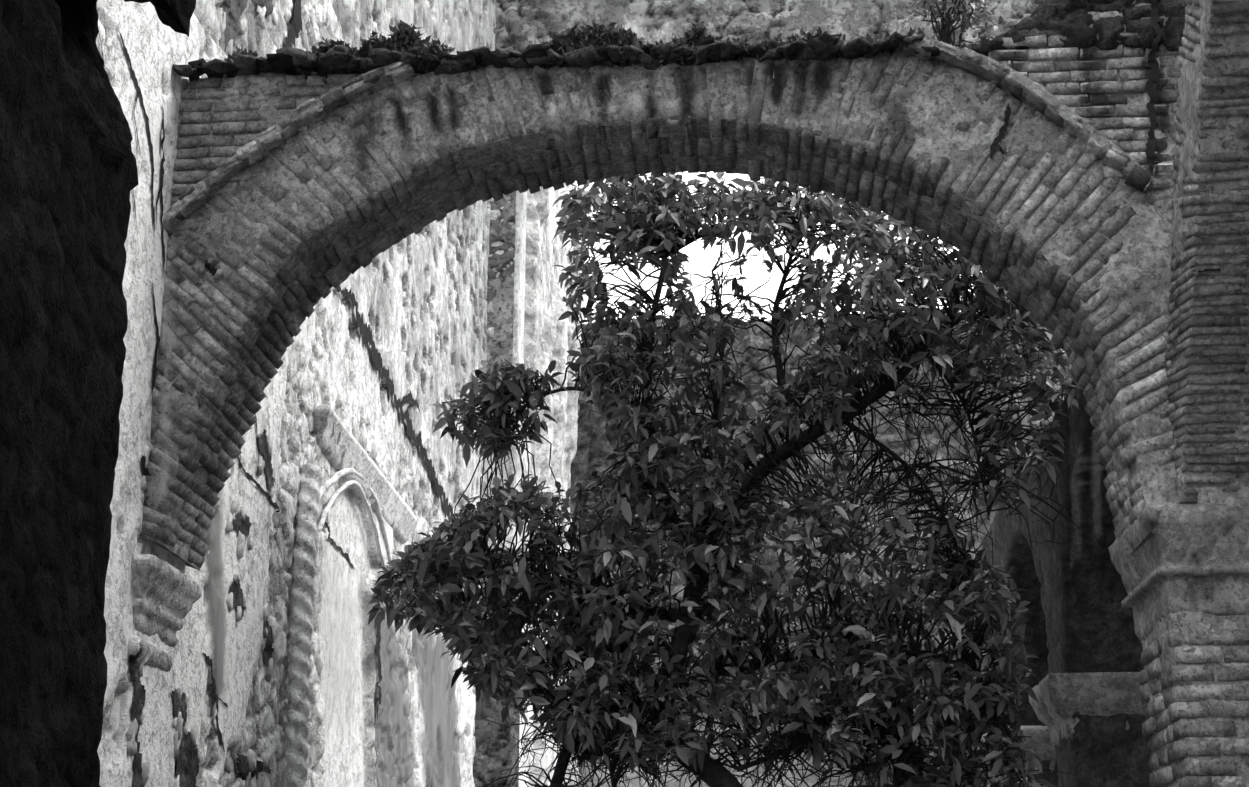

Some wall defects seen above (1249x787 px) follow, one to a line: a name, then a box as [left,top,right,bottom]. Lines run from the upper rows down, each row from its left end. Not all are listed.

crack [285,0,303,47]
crack [336,285,454,527]
peeling [225,499,254,622]
peeling [263,603,277,676]
spalling [114,637,150,787]
spalling [172,687,202,787]
spalling [224,739,271,787]